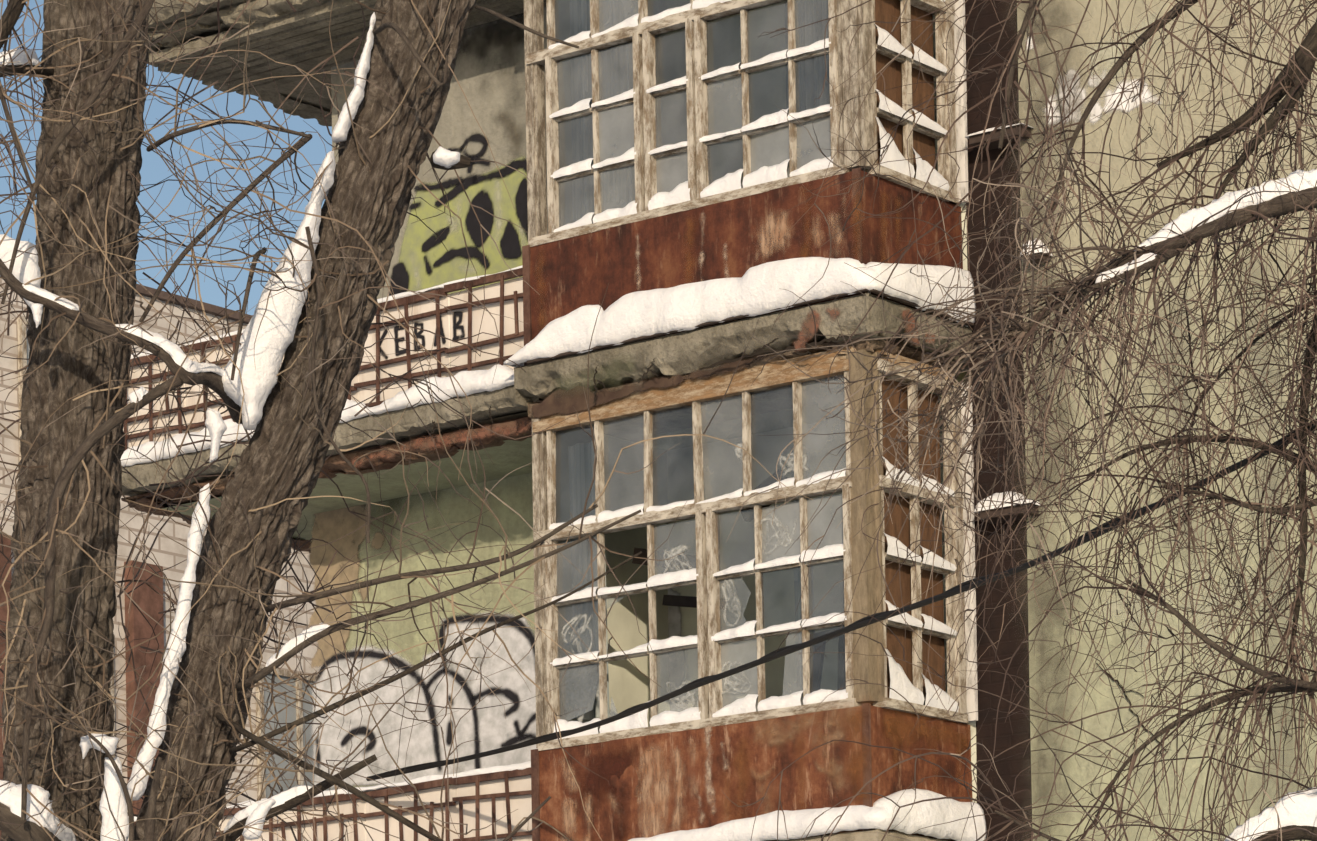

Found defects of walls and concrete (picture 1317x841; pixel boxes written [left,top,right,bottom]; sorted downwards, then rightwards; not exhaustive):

corrosion [584,749,636,799]